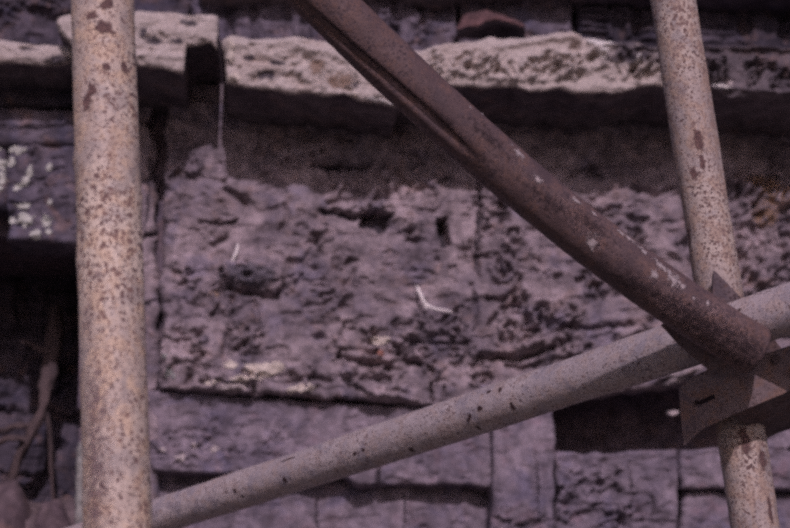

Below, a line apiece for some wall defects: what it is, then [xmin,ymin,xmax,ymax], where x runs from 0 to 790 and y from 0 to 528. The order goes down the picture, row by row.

spalling [225,38,235,63]
spalling [348,92,393,105]